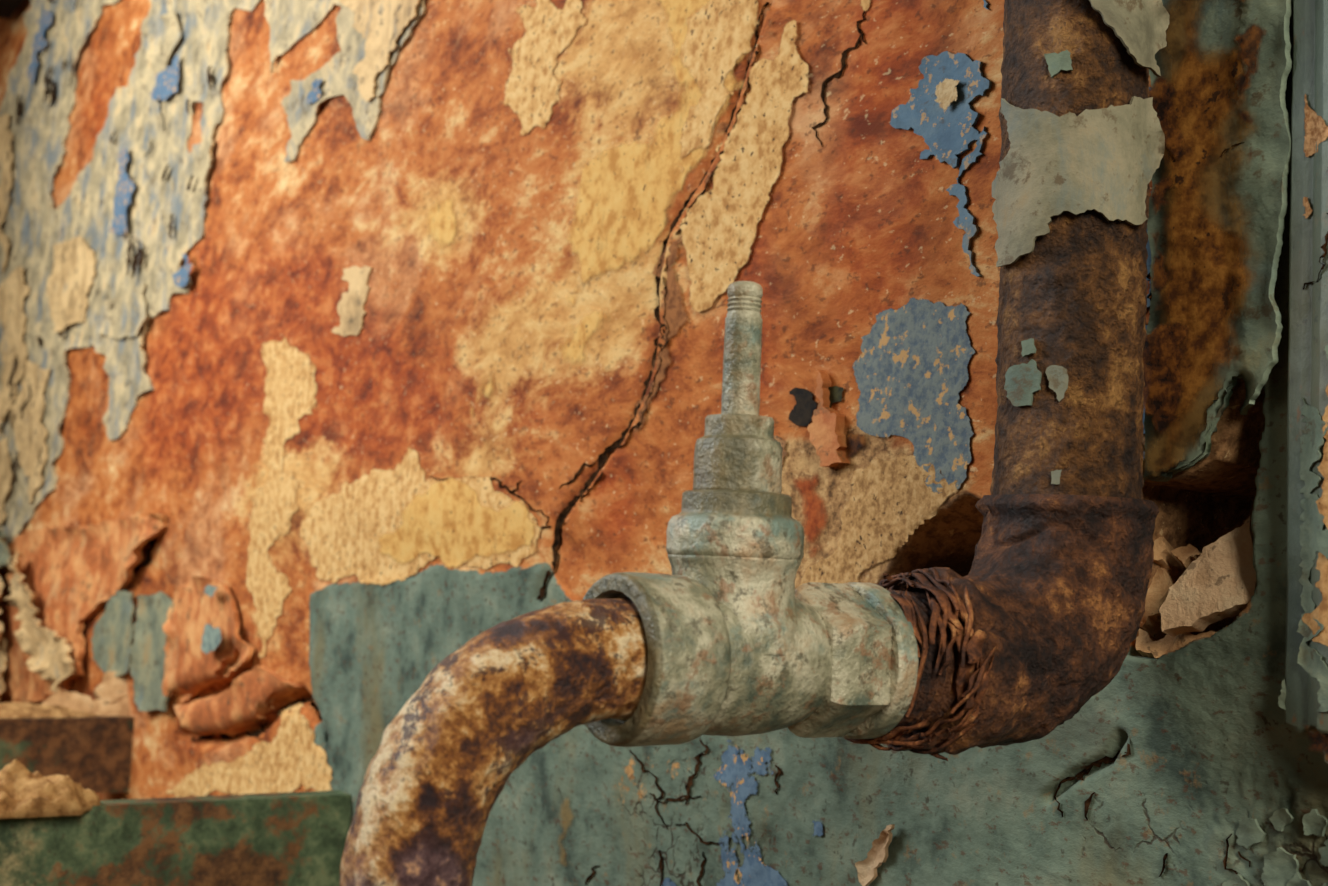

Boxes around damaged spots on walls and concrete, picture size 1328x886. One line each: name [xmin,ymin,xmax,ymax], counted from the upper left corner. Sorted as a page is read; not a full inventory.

peeling [0,0,541,797]
crack [491,2,773,600]
rust [796,477,826,541]
crack [812,11,866,147]
peeling [789,298,975,585]
peeling [890,0,1175,334]
rust [1143,0,1265,475]
peeling [1143,0,1328,482]
peeling [1296,385,1328,712]
crack [629,740,732,886]
crack [1054,736,1131,820]
crack [1223,834,1251,874]